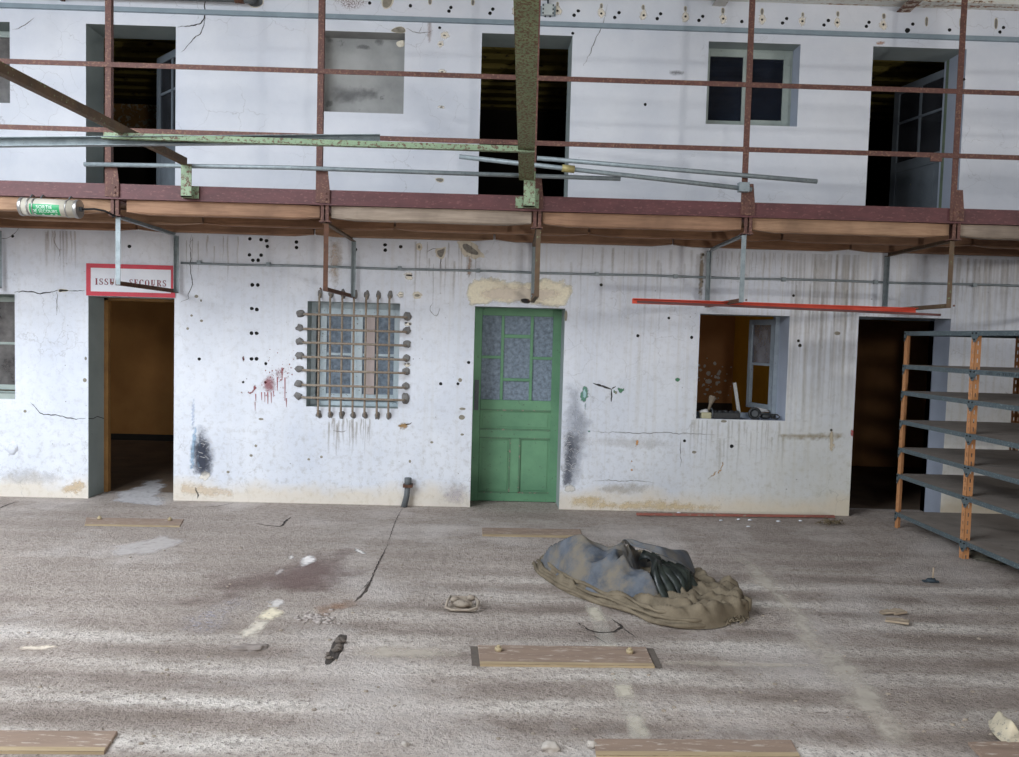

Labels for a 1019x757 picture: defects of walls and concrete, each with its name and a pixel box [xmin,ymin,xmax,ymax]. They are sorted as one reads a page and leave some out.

crack [180,1,206,51]
crack [31,403,104,420]
crack [357,510,402,598]